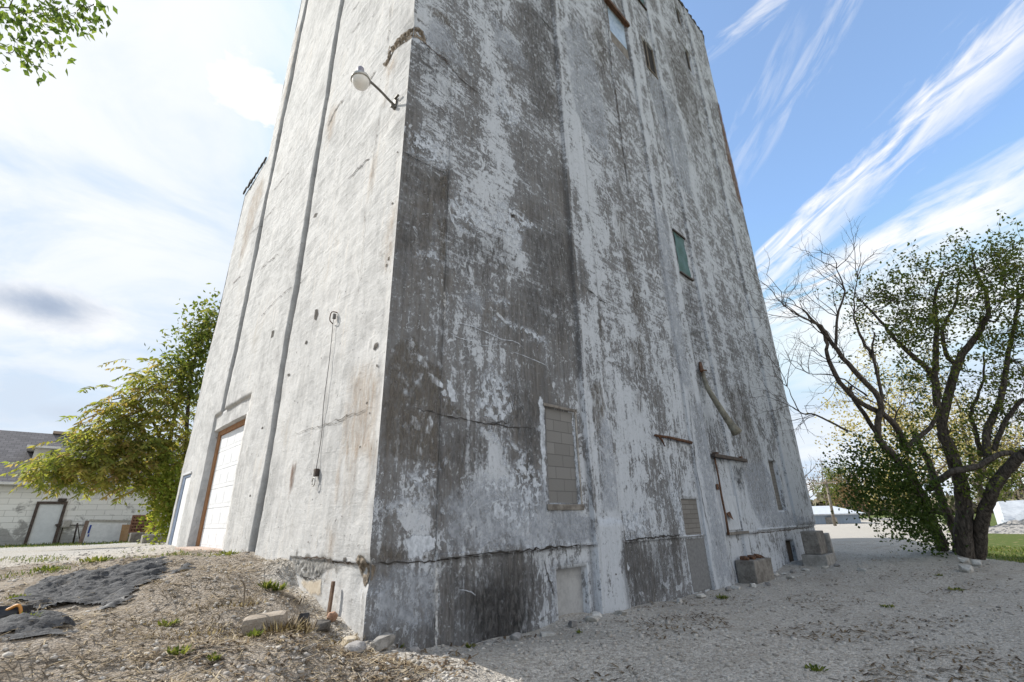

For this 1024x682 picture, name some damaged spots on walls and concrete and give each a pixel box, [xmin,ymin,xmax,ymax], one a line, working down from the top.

spalling [383,27,427,67]
peeling [409,133,542,260]
peeling [490,290,543,342]
peeling [399,341,456,405]
crack [295,407,376,434]
crack [403,407,532,429]
peeling [592,381,605,432]
peeling [293,525,436,595]
crack [300,544,591,594]
crack [625,533,680,541]